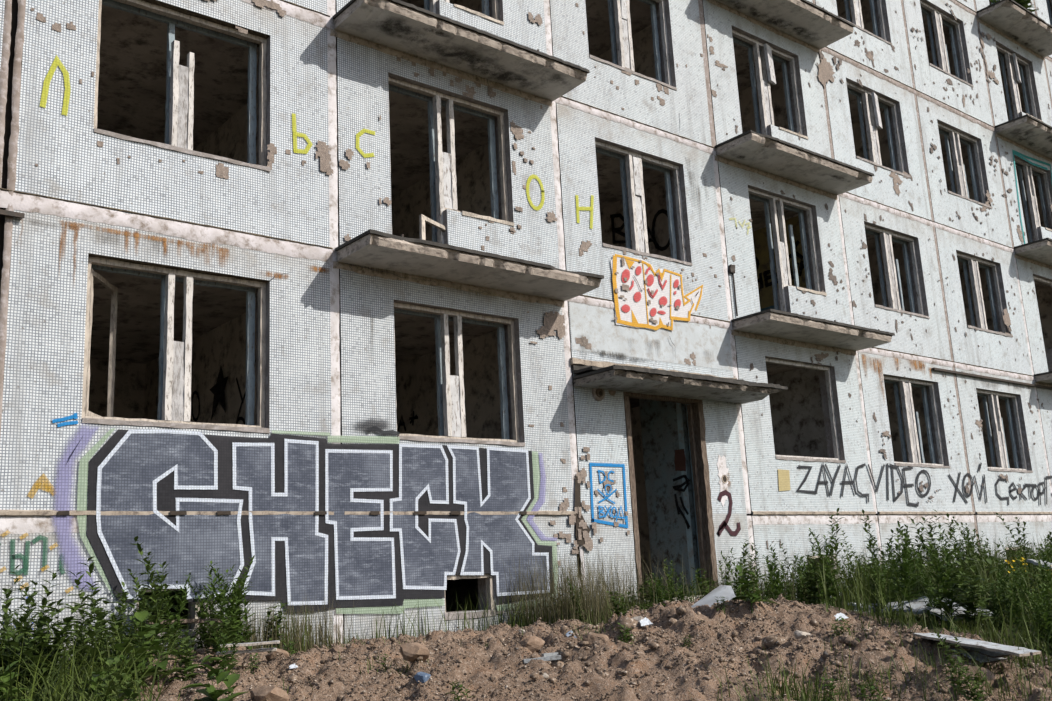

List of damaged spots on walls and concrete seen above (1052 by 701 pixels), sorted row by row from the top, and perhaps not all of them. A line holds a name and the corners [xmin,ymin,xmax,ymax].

peeling [252,0,286,17]
peeling [805,51,844,88]
peeling [850,31,899,87]
peeling [198,162,229,179]
peeling [267,140,354,175]
peeling [510,120,535,175]
rust [60,223,79,258]
rust [97,227,228,258]
peeling [530,311,591,349]
spalling [550,447,630,554]